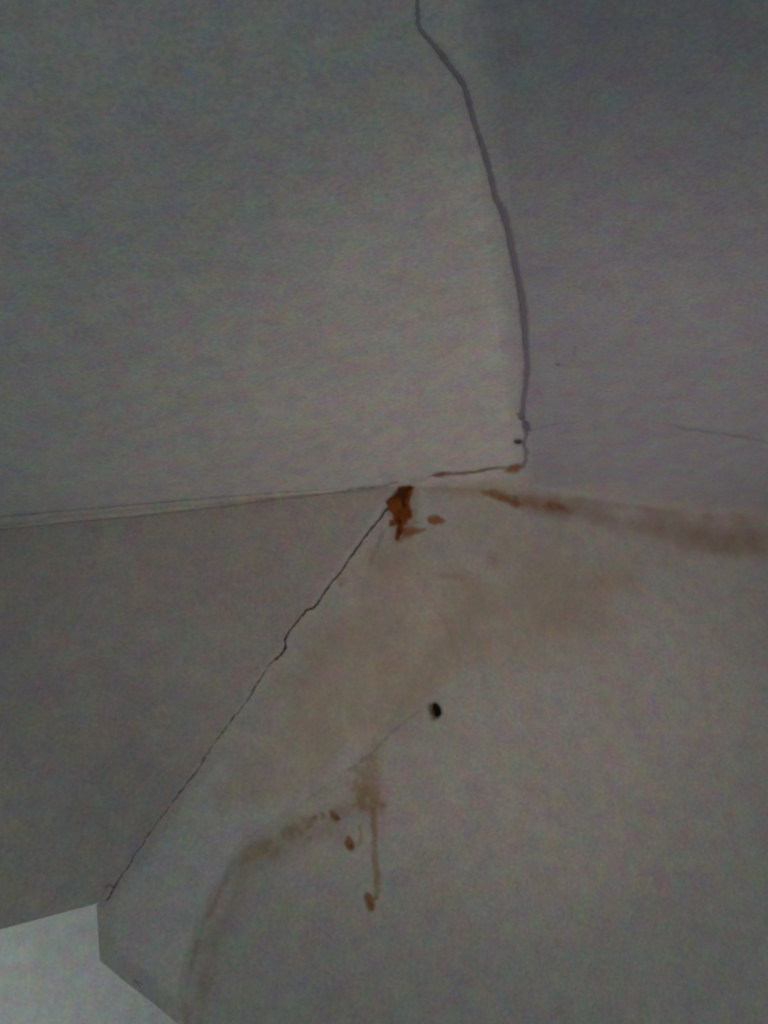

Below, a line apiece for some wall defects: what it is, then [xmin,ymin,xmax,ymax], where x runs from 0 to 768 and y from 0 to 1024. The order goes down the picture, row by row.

crack [416,0,531,467]
crack [250,483,393,696]
rust [386,486,444,541]
rust [366,893,375,911]